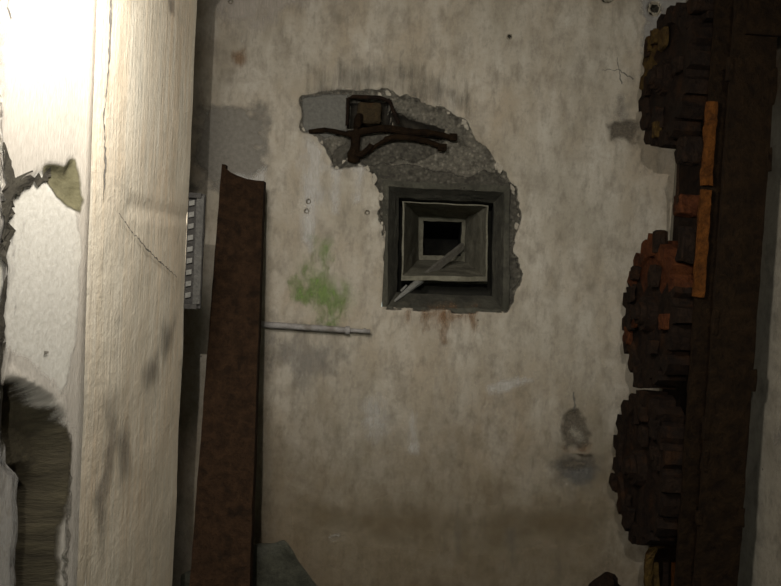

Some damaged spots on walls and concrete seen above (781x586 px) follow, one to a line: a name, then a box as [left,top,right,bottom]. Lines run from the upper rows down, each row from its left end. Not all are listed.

crack [0,142,52,399]
flaking render [0,0,97,586]
spalling [299,88,523,313]